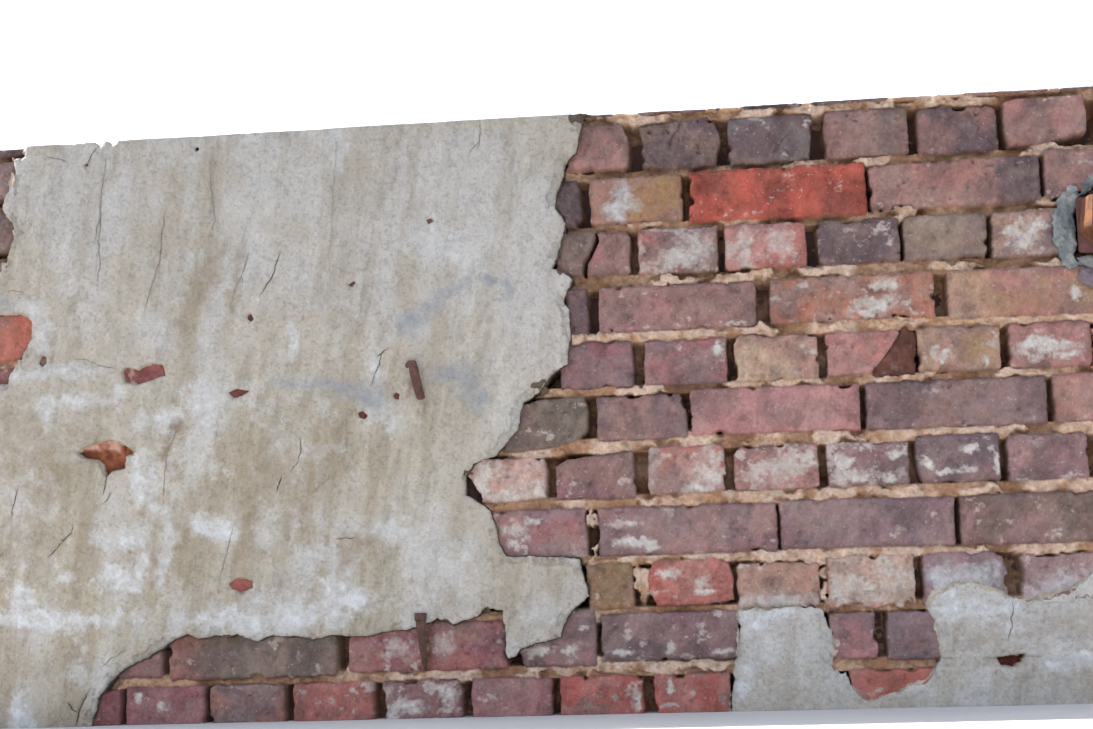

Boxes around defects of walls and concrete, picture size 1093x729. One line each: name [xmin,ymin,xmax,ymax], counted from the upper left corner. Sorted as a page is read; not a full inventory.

spalling [122,363,165,385]
corrosion [401,368,431,424]
flaking render [463,113,592,659]
spalling [873,327,916,378]
spalling [77,439,134,477]
flaking render [92,607,503,726]
corrosion [418,622,436,689]
flaking render [729,571,1093,711]